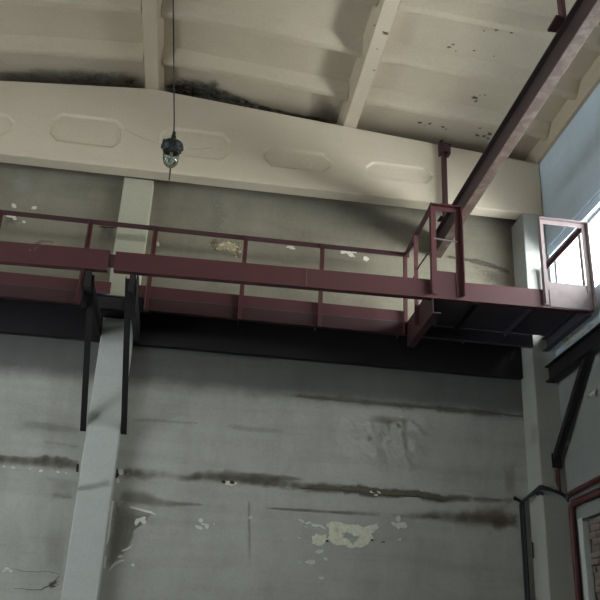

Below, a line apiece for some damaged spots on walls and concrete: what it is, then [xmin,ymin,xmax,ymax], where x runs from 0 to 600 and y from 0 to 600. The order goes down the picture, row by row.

leakage [21,74,96,84]
leakage [170,80,248,106]
leakage [258,106,319,120]
peeling [213,241,241,258]
leakage [0,455,72,474]
leakage [217,476,469,502]
peeling [127,506,156,538]
leakage [424,513,516,526]
peeling [298,519,379,565]
crack [15,569,60,590]